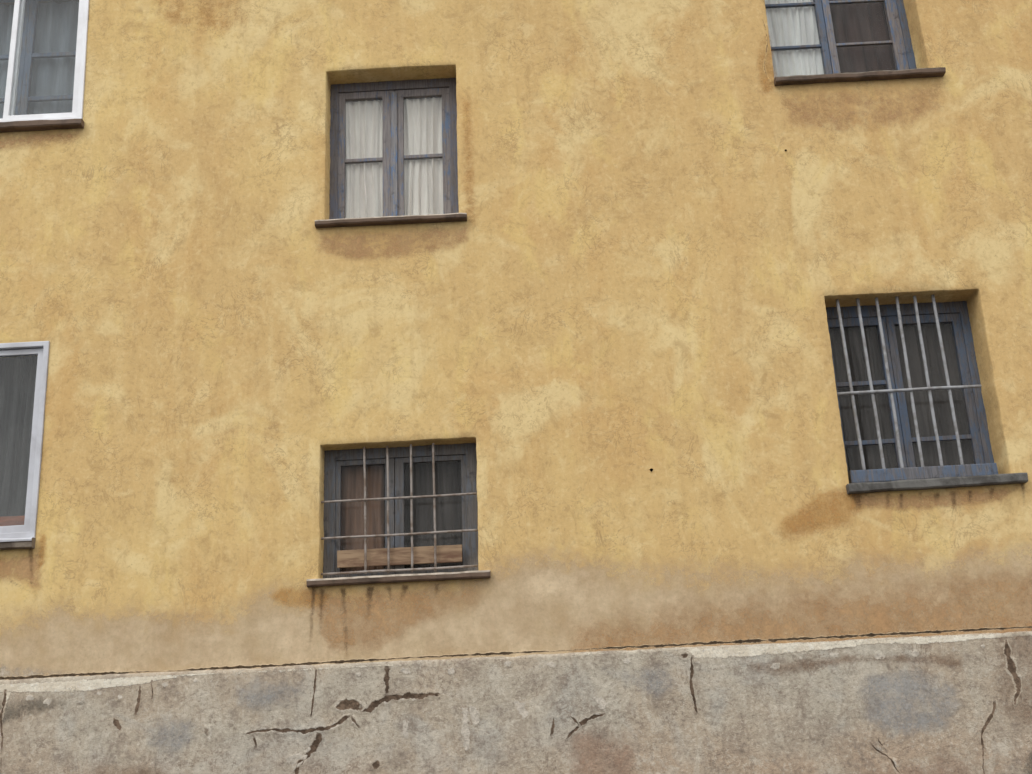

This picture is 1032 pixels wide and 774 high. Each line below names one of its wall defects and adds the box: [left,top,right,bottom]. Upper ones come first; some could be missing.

leakage [0,549,1032,677]
crack [245,666,441,774]
crack [978,638,1024,774]